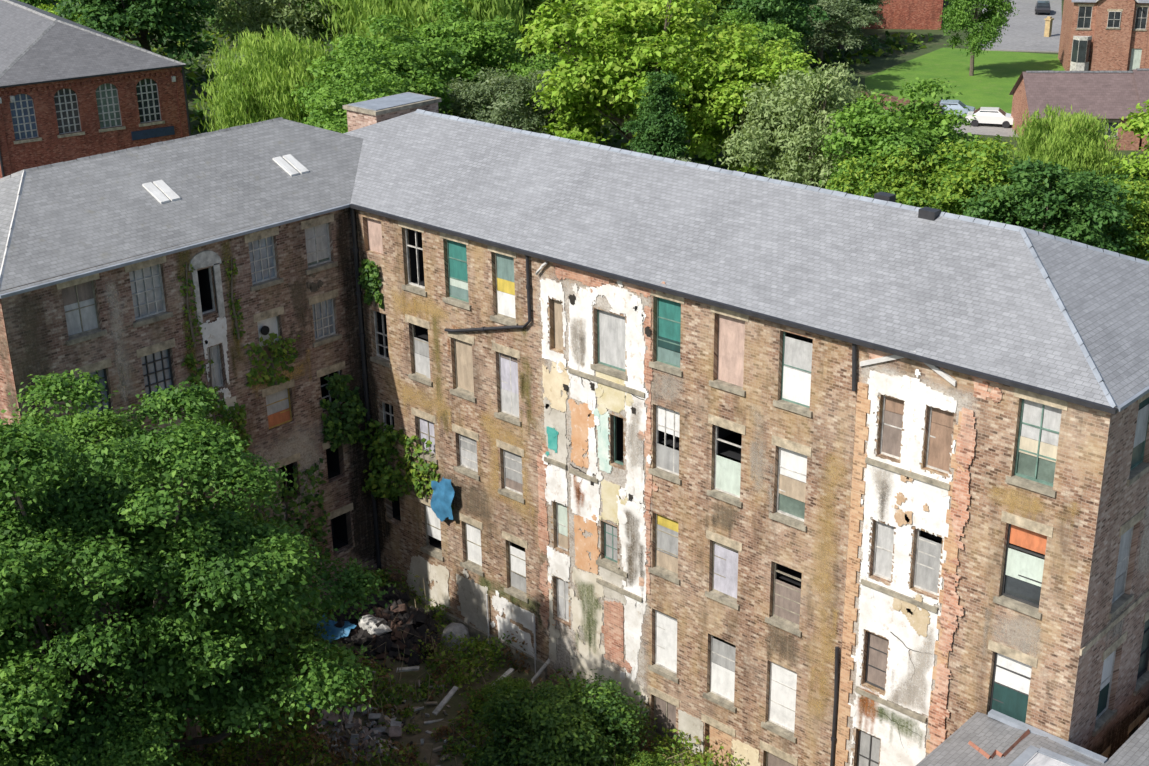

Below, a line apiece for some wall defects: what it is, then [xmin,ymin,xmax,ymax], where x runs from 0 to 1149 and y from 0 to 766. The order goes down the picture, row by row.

flaking render [406,262,665,725]
leakage [626,512,643,585]
flaking render [848,348,1003,766]